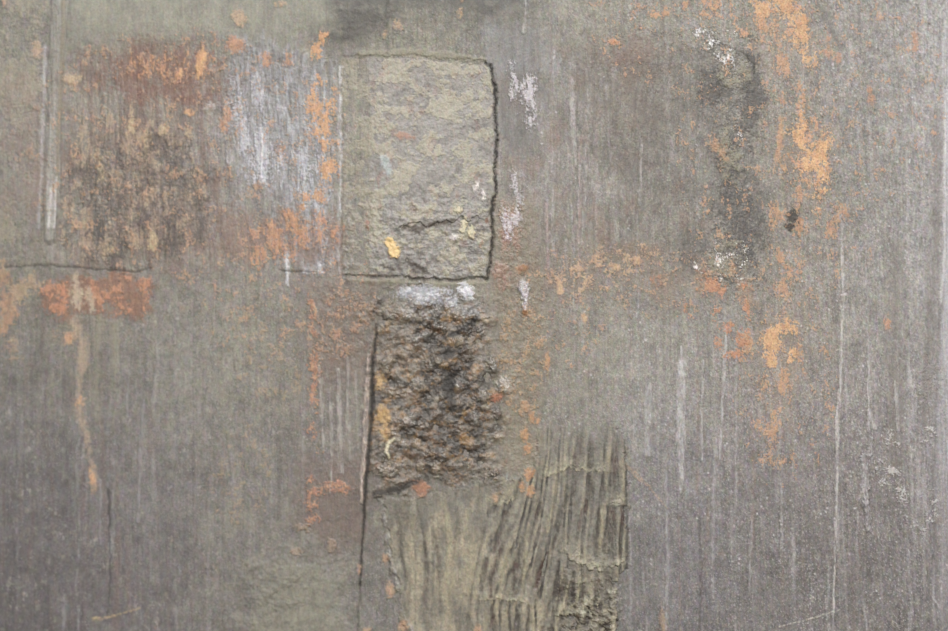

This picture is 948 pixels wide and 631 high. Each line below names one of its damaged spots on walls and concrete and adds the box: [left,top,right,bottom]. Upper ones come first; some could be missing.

crack [3,263,155,274]
peeling [0,0,355,288]
rust [0,7,398,599]
crack [278,266,315,274]
crack [356,324,378,631]
peeling [382,234,402,259]
crack [338,0,500,283]
spalling [345,242,514,519]
spalling [532,557,620,631]
rust [480,0,948,499]